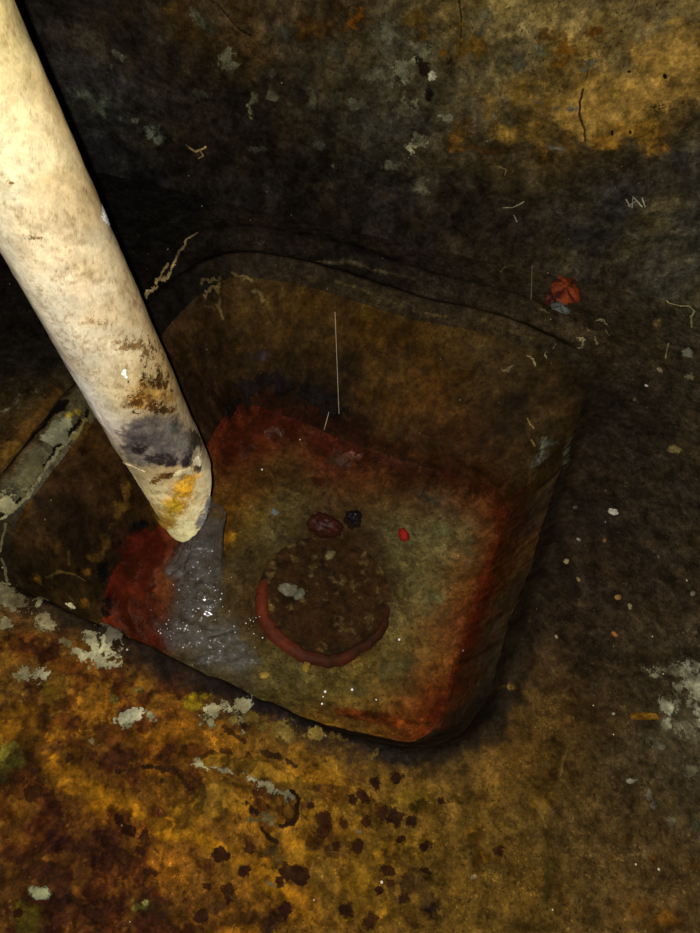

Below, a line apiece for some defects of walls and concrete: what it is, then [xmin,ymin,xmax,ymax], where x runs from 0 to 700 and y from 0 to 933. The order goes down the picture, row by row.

corrosion [149,469,177,485]
corrosion [34,481,167,649]
damp [183,693,208,710]
damp [644,658,700,744]
corrosion [0,704,445,933]